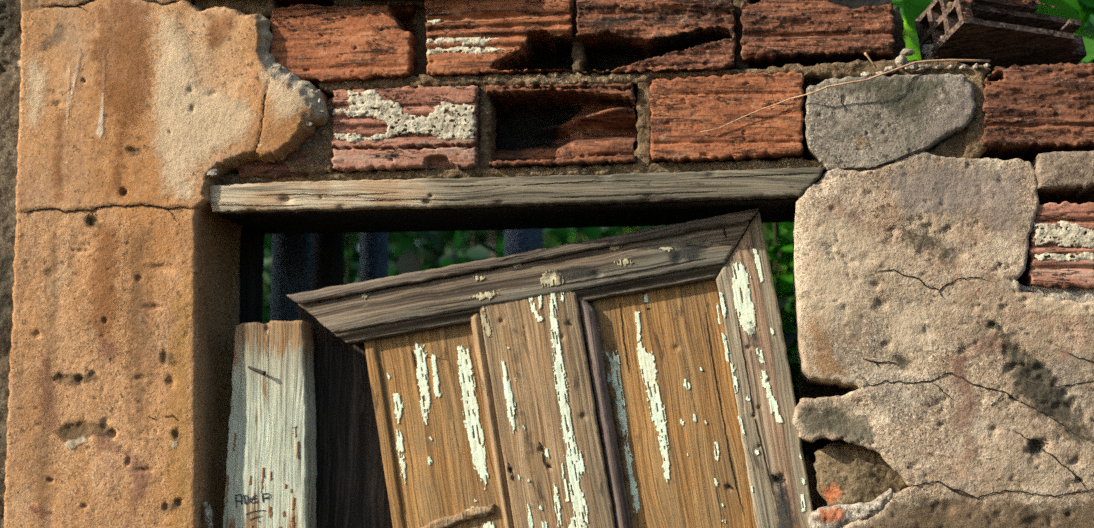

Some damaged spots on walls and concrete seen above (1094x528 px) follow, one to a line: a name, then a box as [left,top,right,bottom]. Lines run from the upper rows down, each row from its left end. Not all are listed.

crack [43,0,94,11]
crack [144,0,176,8]
flaking render [257,15,329,162]
crack [18,204,201,225]
crack [864,264,989,297]
spalling [53,422,111,449]
crack [863,351,1094,499]